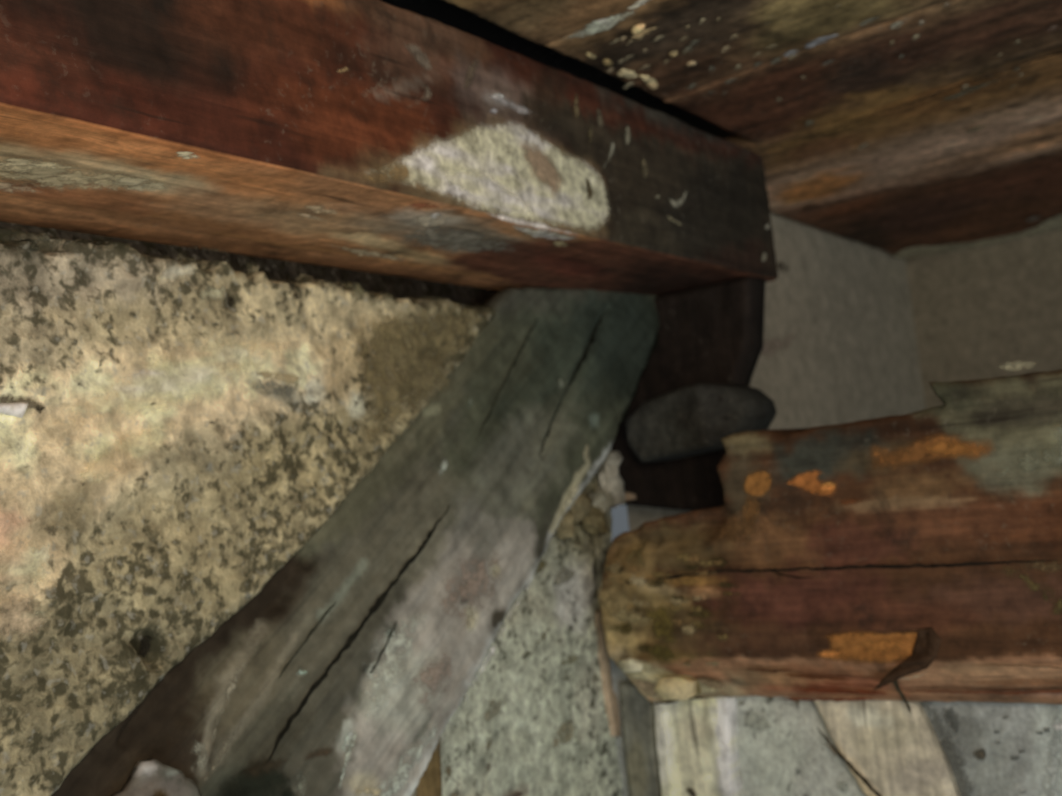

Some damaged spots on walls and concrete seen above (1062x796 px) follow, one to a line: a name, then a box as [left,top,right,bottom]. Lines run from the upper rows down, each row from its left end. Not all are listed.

leakage [0,158,167,192]
leakage [519,228,573,246]
crack [540,313,604,453]
crack [622,560,1059,586]
crack [265,505,450,766]